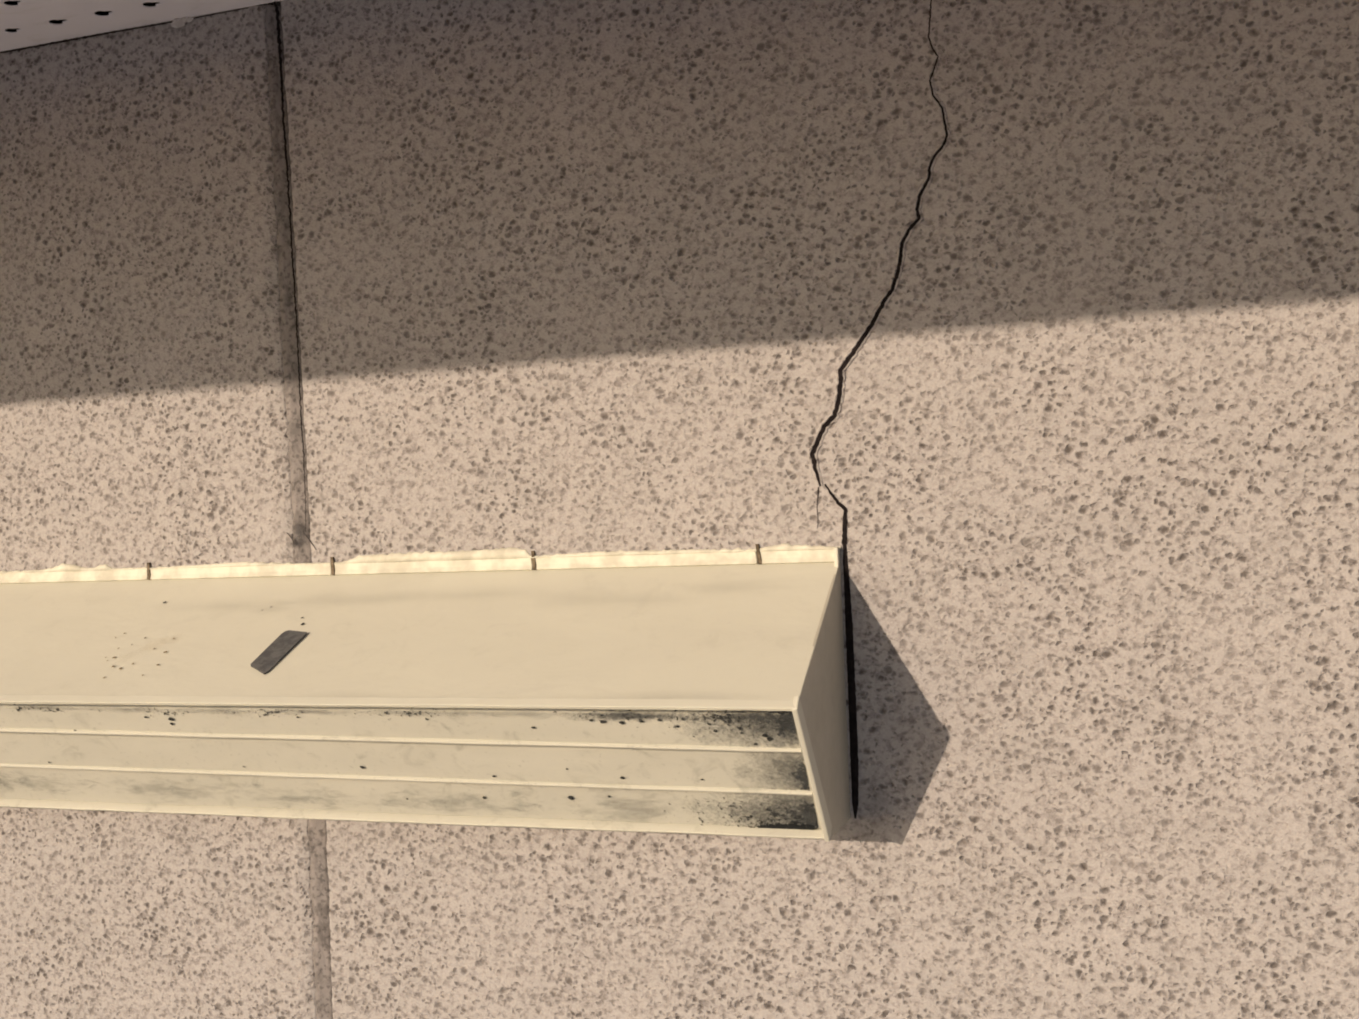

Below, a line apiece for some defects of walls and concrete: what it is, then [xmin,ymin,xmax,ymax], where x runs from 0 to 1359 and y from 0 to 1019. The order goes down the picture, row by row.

crack [807,0,951,545]